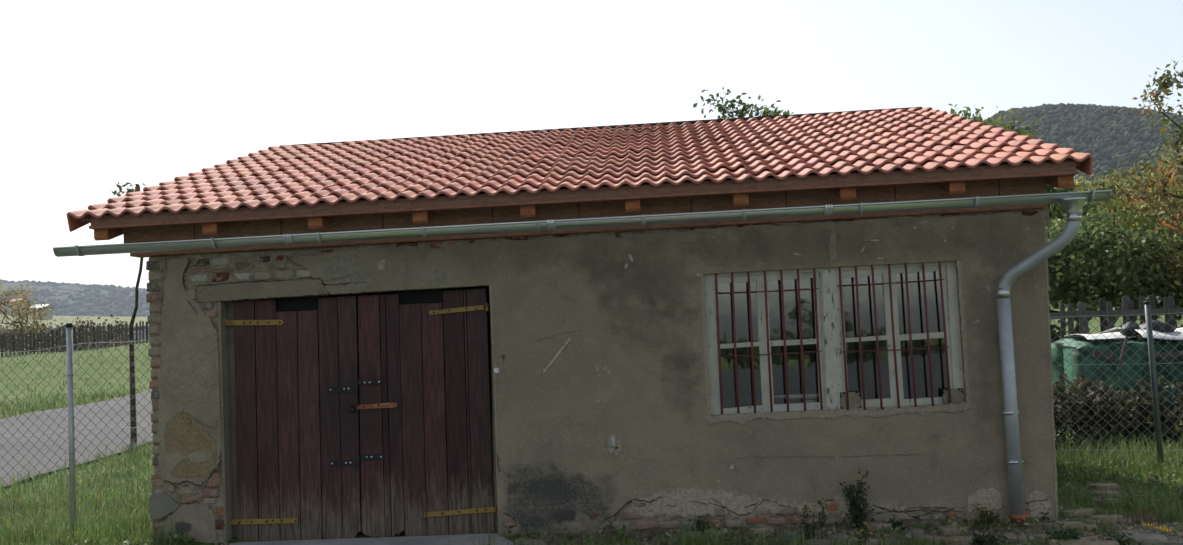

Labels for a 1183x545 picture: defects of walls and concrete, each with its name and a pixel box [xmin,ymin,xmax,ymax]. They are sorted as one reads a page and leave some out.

damp [508,467,608,533]
flaking render [146,207,1050,543]
crack [598,496,797,528]
flaking render [1035,259,1059,520]